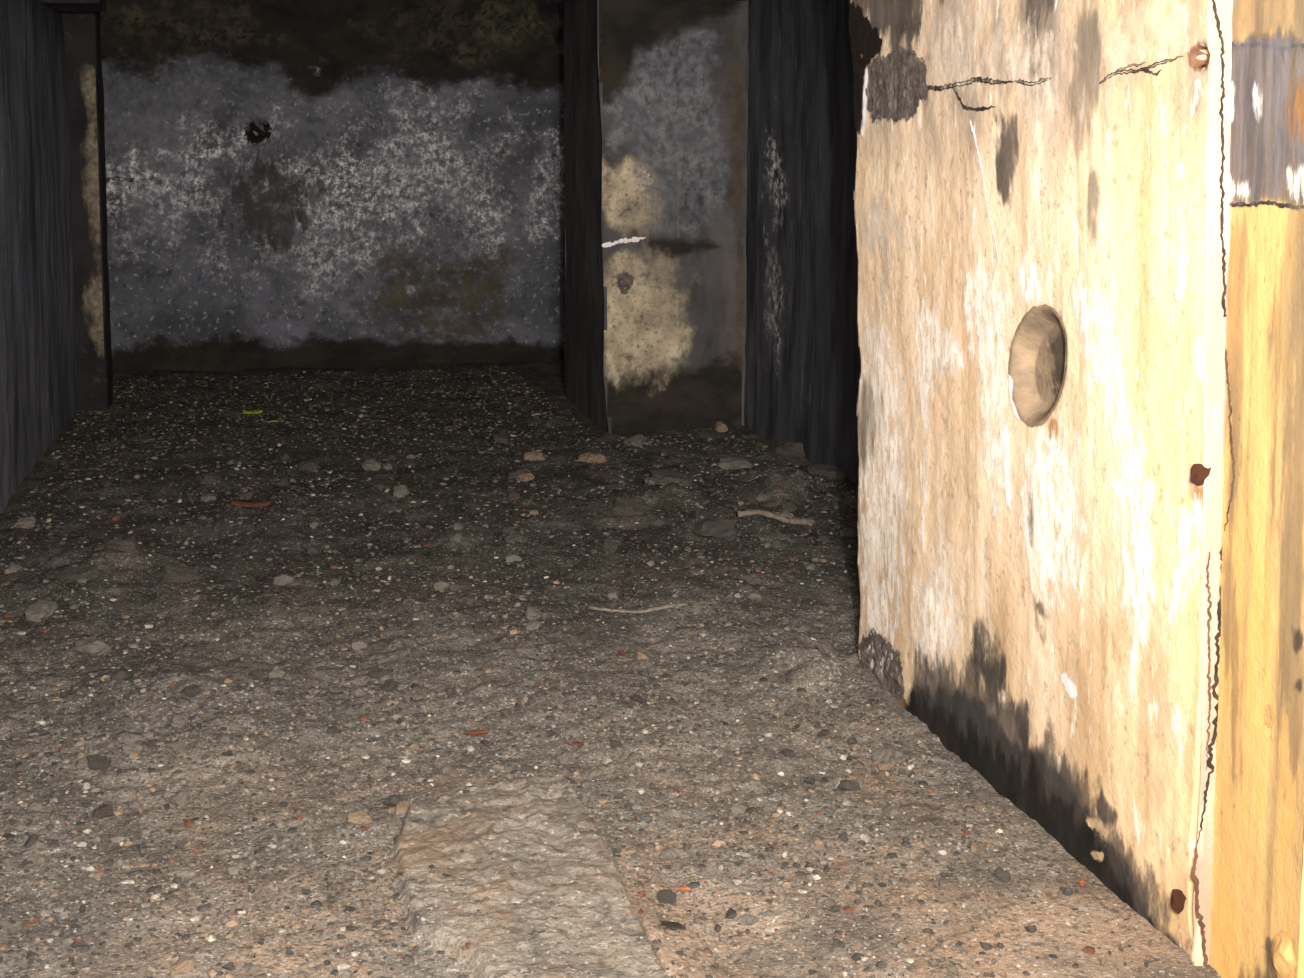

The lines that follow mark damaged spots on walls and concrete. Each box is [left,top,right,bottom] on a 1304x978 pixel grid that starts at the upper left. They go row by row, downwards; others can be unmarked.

leakage [898,20,921,53]
crack [1099,56,1182,130]
corrosion [1189,43,1210,70]
leakage [1229,0,1304,333]
crack [1190,0,1304,966]
leakage [1280,401,1303,700]
leakage [974,622,1006,704]
leakage [1128,633,1141,703]
leakage [1016,701,1029,749]
leakage [1097,795,1117,823]